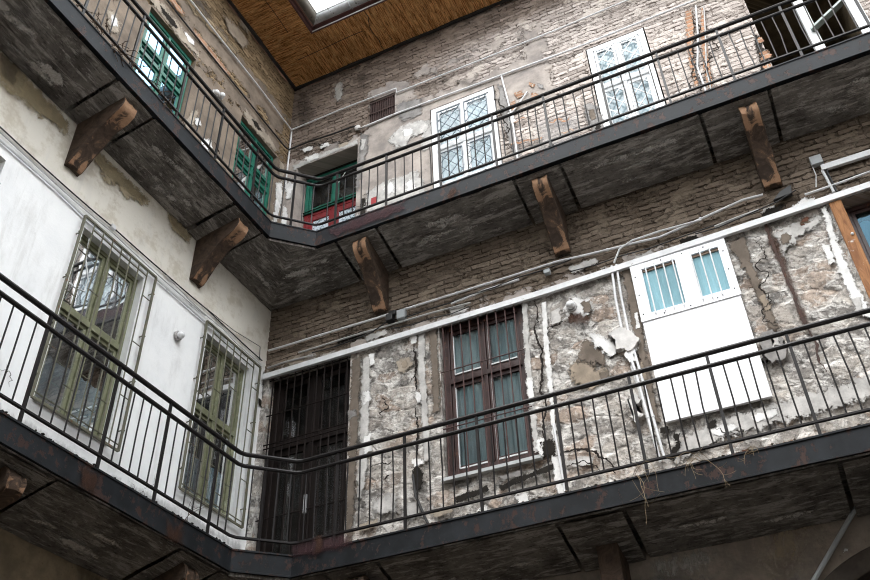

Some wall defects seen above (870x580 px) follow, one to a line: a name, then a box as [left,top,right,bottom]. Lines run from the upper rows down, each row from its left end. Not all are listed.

peeling [0,0,37,37]
flaking render [684,8,719,92]
flaking render [0,43,70,136]
peeling [400,118,433,152]
peeling [549,308,561,325]
flaking render [564,332,647,391]
crack [533,299,615,494]